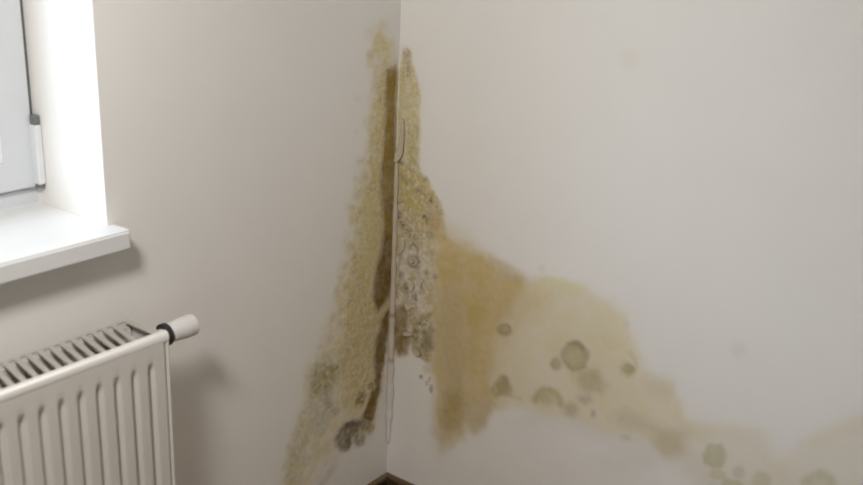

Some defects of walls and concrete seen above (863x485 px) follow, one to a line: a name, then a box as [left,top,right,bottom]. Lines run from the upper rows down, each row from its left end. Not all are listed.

damp [383,75,395,176]
damp [345,197,406,448]